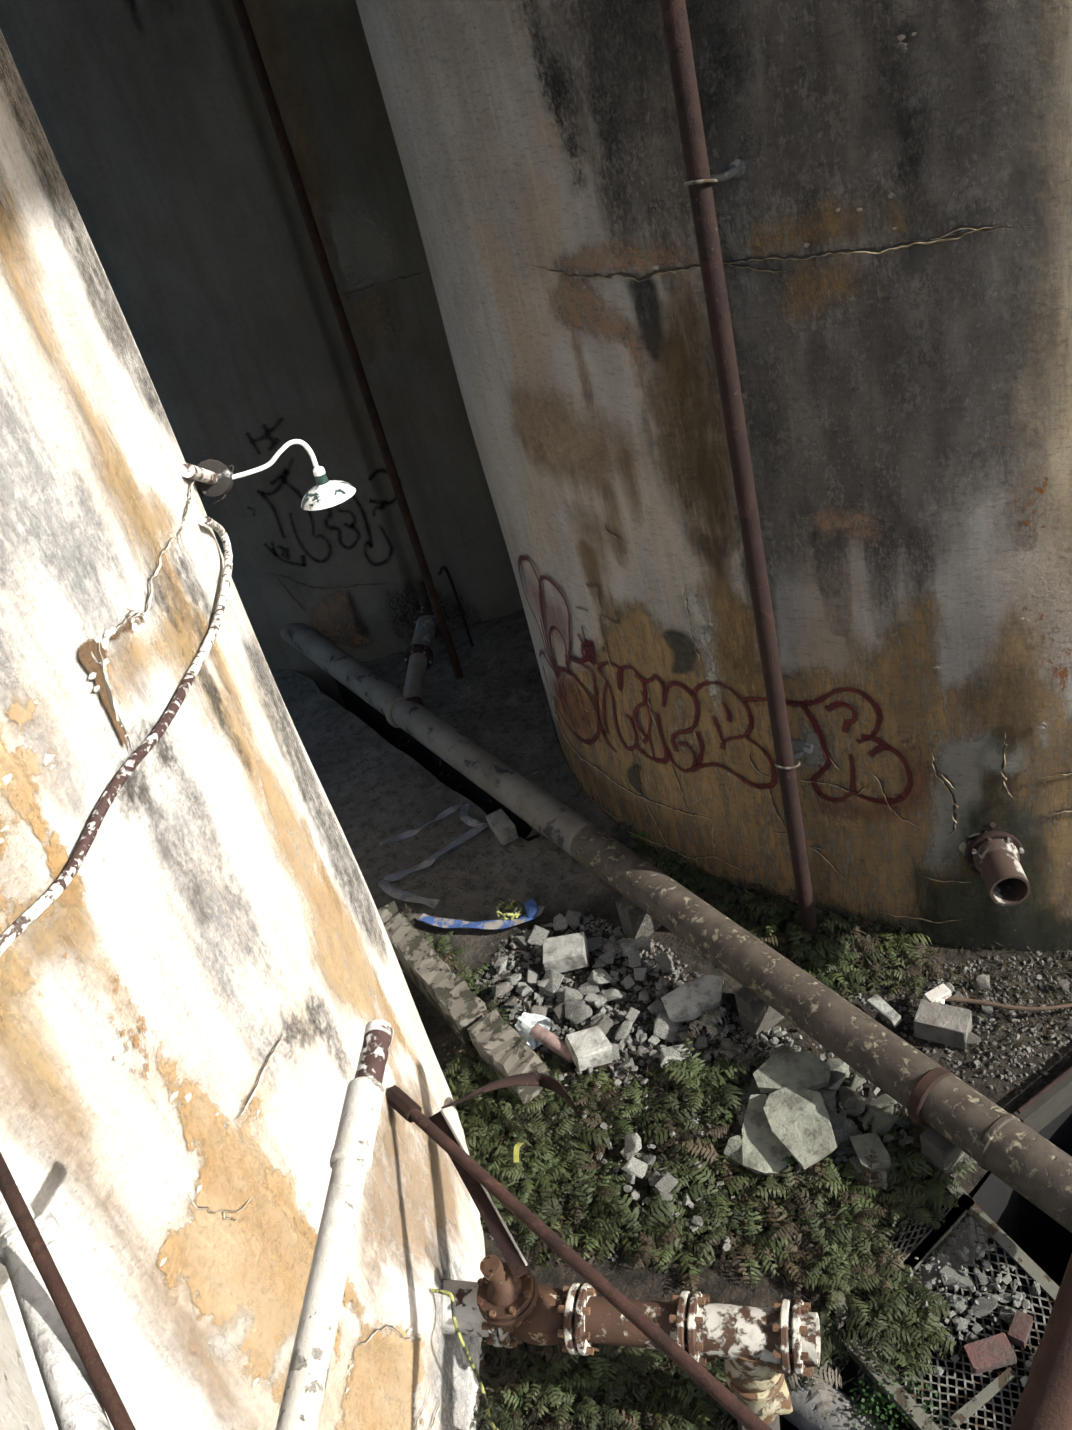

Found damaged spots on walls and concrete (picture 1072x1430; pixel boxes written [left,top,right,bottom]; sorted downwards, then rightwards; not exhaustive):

damp [523,0,737,584]
crack [527,224,1038,282]
damp [685,0,1072,609]
crack [91,479,195,752]
peeling [0,697,86,997]
crack [547,639,776,889]
peeling [551,591,1072,935]
crack [748,747,959,879]
damp [818,674,1072,952]
crack [1001,733,1072,816]
peeling [107,978,318,1405]
peeling [334,1277,365,1365]